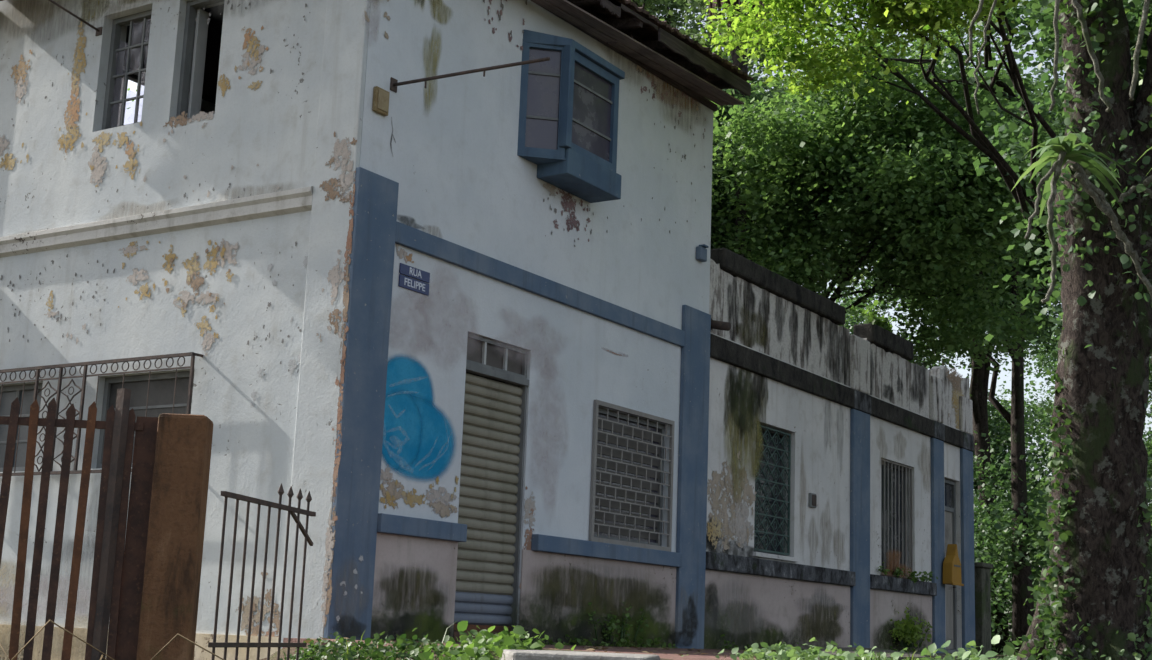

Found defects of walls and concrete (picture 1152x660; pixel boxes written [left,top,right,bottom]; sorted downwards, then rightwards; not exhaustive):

peeling [218,26,272,97]
damp [425,36,440,103]
peeling [54,21,149,213]
peeling [0,239,239,356]
damp [728,279,850,386]
peeling [316,132,364,638]
damp [870,360,926,405]
damp [724,366,768,486]
peeling [380,464,460,518]
flaking render [235,572,280,637]
mould [370,571,450,642]
damp [512,569,675,648]